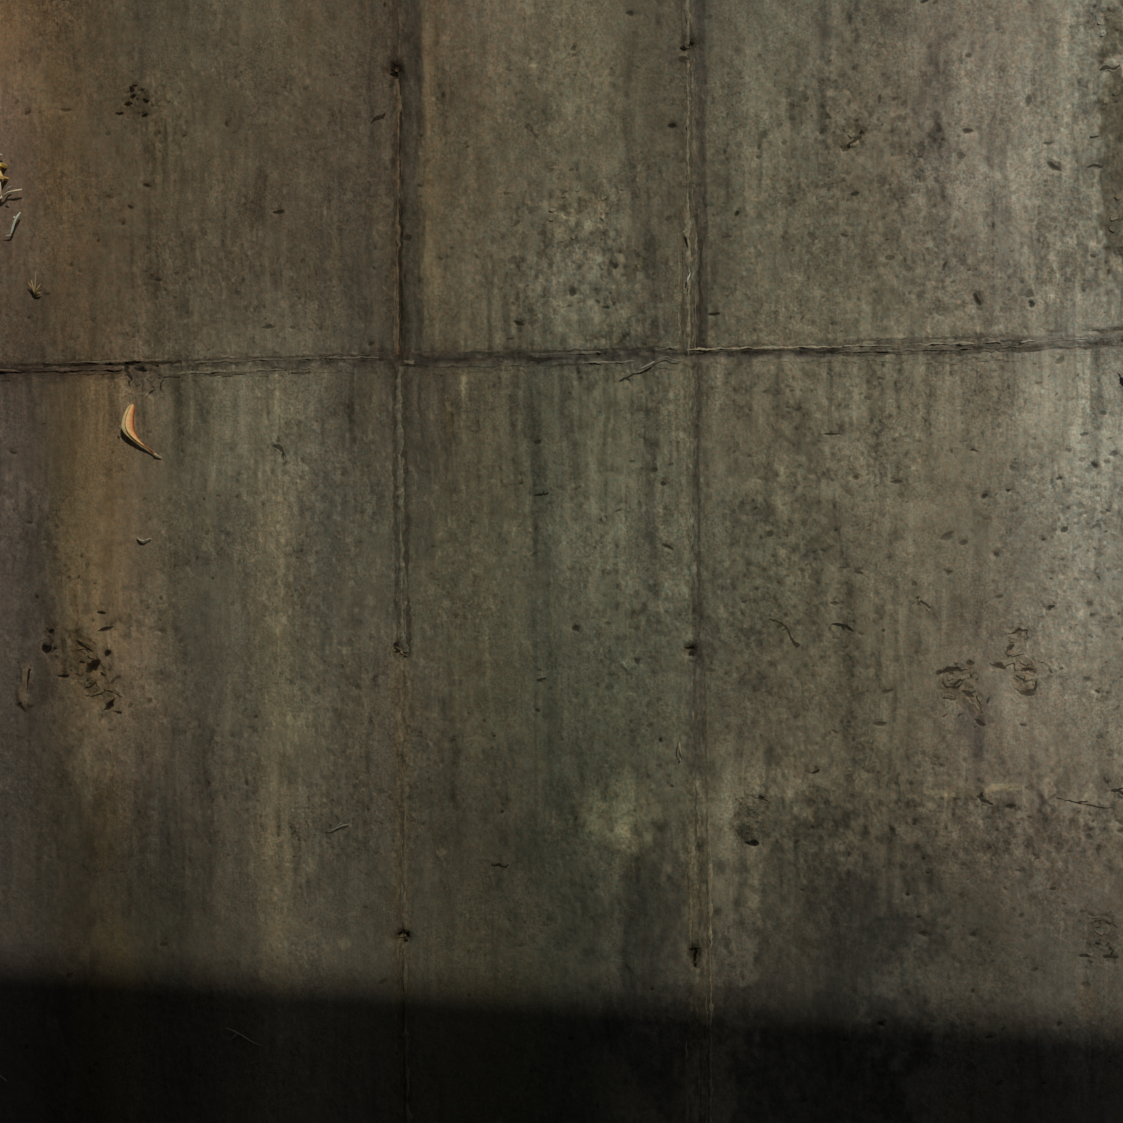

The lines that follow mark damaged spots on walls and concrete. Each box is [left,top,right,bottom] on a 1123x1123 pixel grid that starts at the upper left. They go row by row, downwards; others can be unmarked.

leakage [996,0,1104,333]
leakage [709,353,1123,1123]